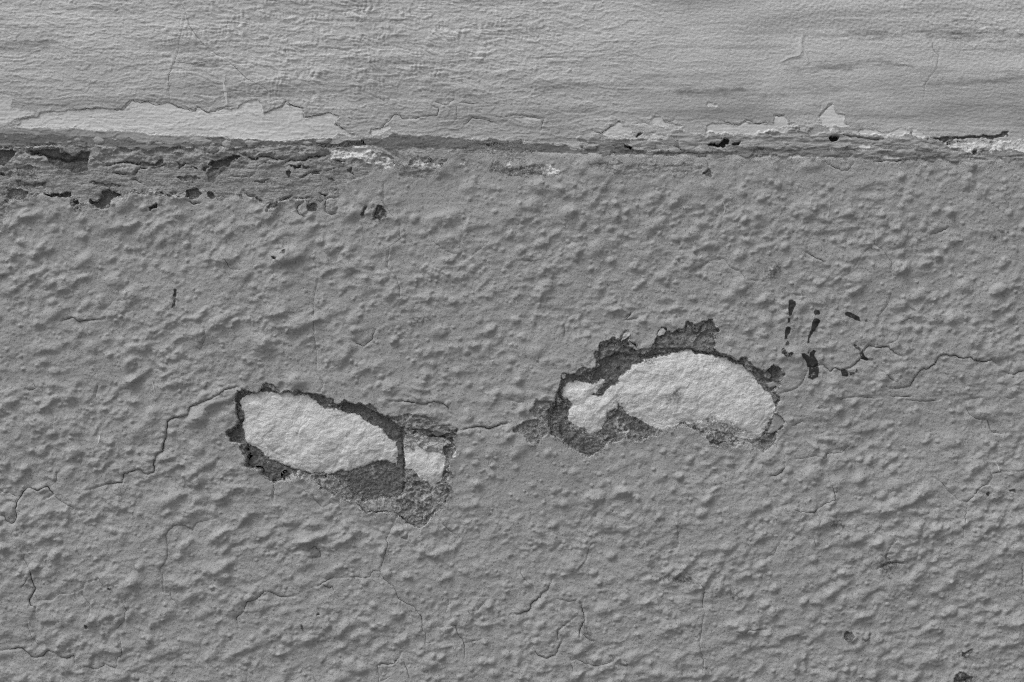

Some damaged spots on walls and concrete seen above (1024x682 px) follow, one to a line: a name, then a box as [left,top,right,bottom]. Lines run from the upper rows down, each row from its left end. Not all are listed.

flaking render [578,103,1024,177]
crack [1,476,74,524]
crack [93,387,235,489]
flaking render [226,381,466,528]
flaking render [513,319,785,457]
crack [786,298,1022,426]